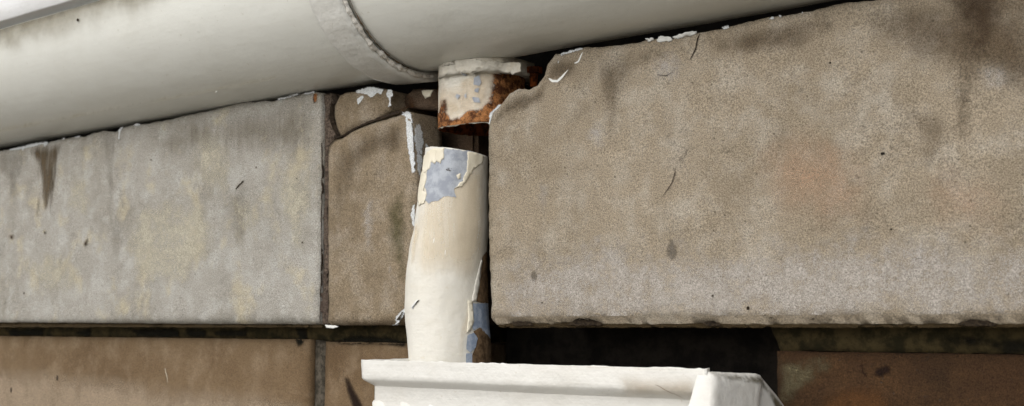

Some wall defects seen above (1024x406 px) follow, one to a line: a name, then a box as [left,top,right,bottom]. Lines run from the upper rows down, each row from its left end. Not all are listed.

peeling [356,87,393,107]
rust [438,73,525,133]
water stain [35,147,57,206]
peeling [402,111,484,226]
peeling [466,251,491,363]